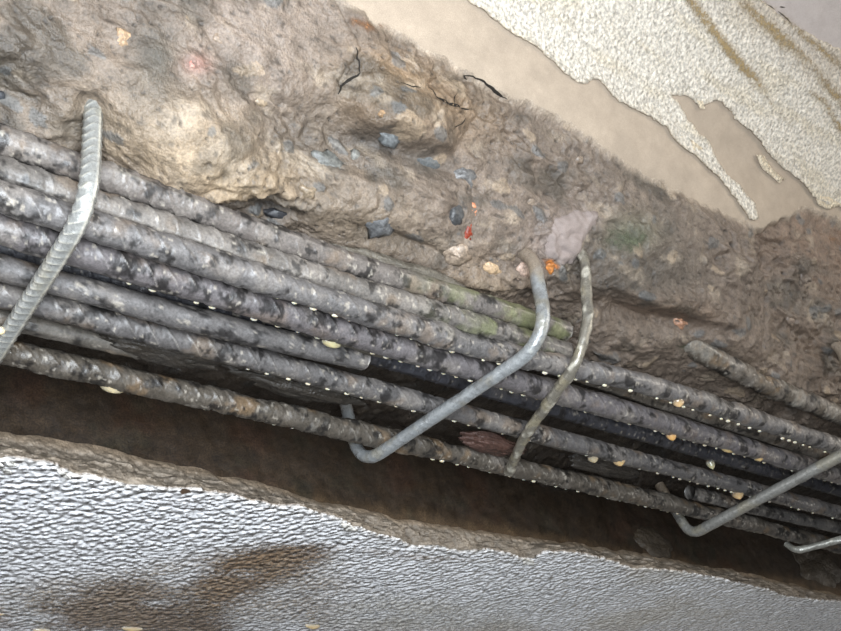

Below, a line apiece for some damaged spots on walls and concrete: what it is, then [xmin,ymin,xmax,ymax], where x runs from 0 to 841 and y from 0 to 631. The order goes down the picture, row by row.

spalling [0,0,841,476]
water stain [9,544,347,631]
peeling [0,432,841,631]
spalling [510,359,841,520]